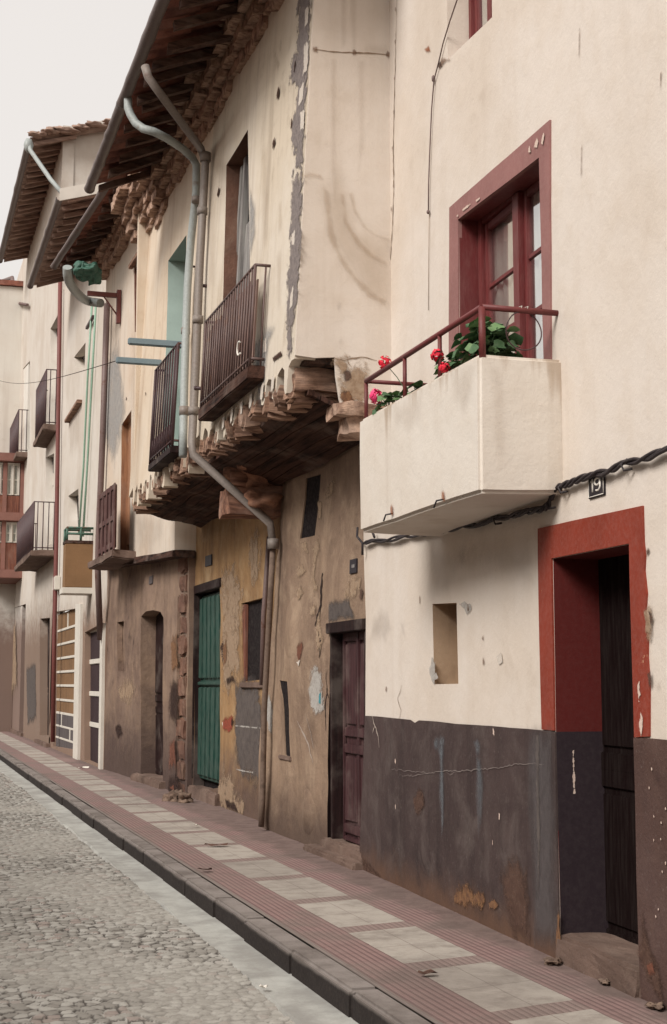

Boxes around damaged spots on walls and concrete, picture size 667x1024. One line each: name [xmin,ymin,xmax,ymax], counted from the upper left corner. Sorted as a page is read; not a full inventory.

peeling [272,0,312,361]
spalling [644,606,652,640]
peeling [637,672,651,733]
crack [392,762,541,777]
spalling [454,882,498,909]